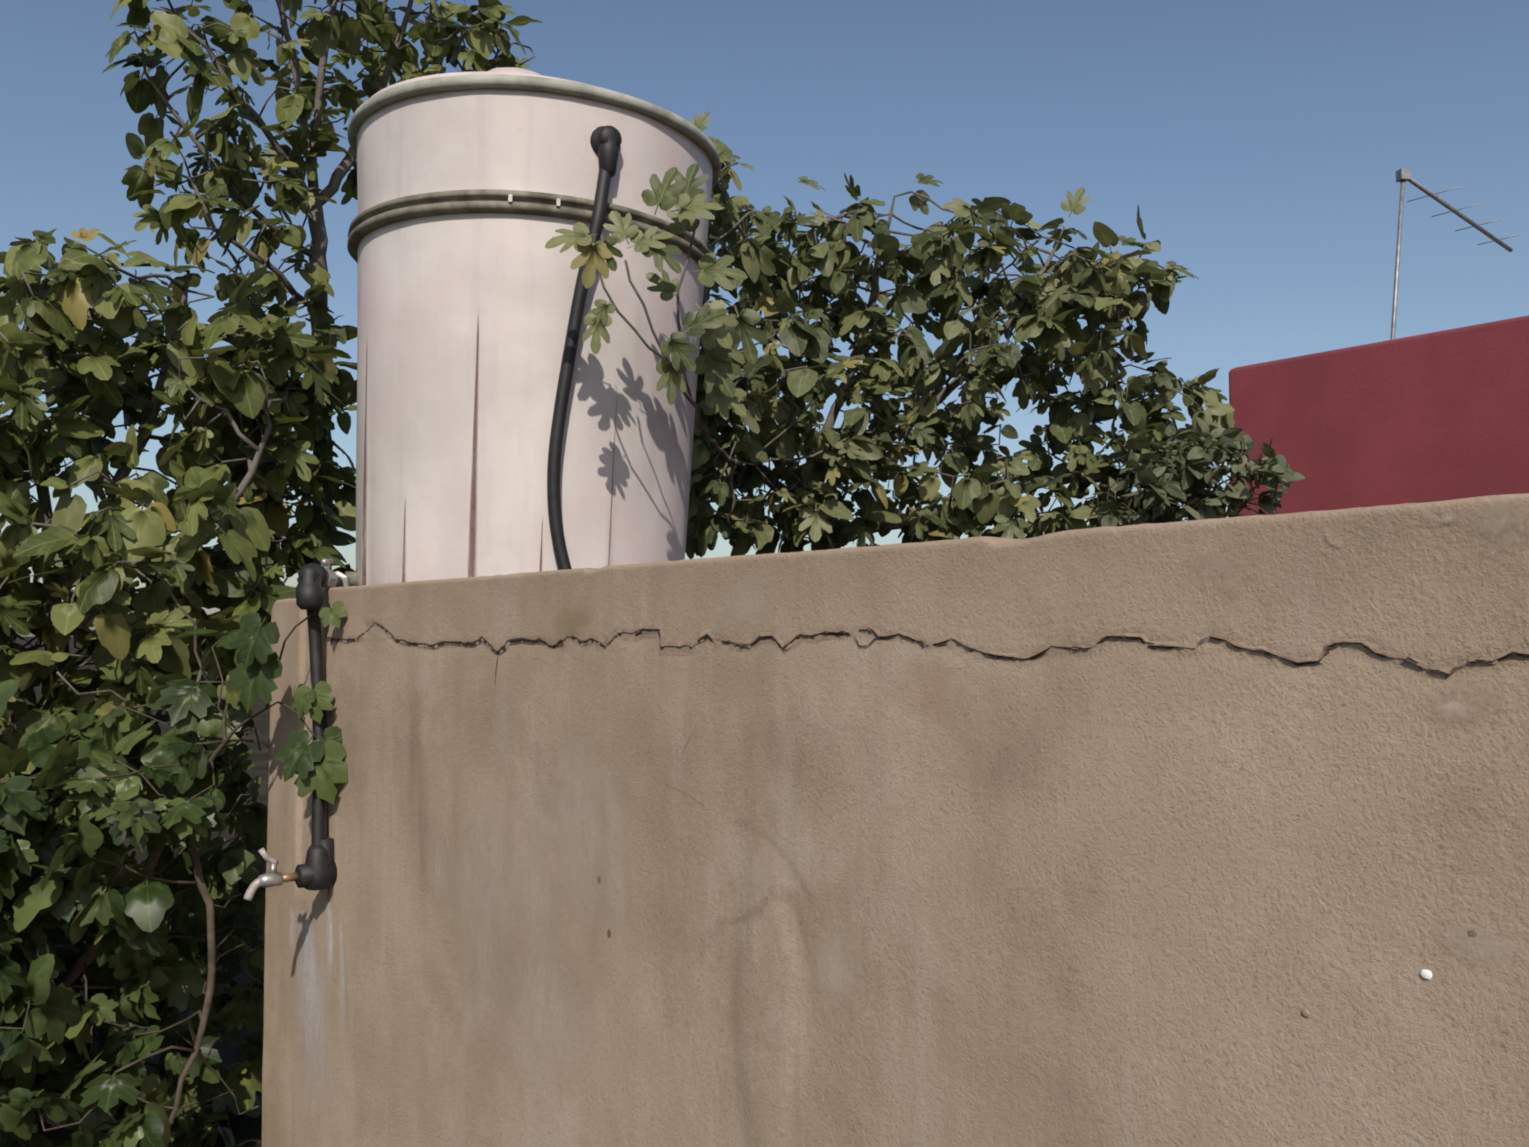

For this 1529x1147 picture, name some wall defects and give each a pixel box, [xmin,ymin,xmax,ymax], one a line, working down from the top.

crack [325,623,1529,728]
crack [322,801,330,838]